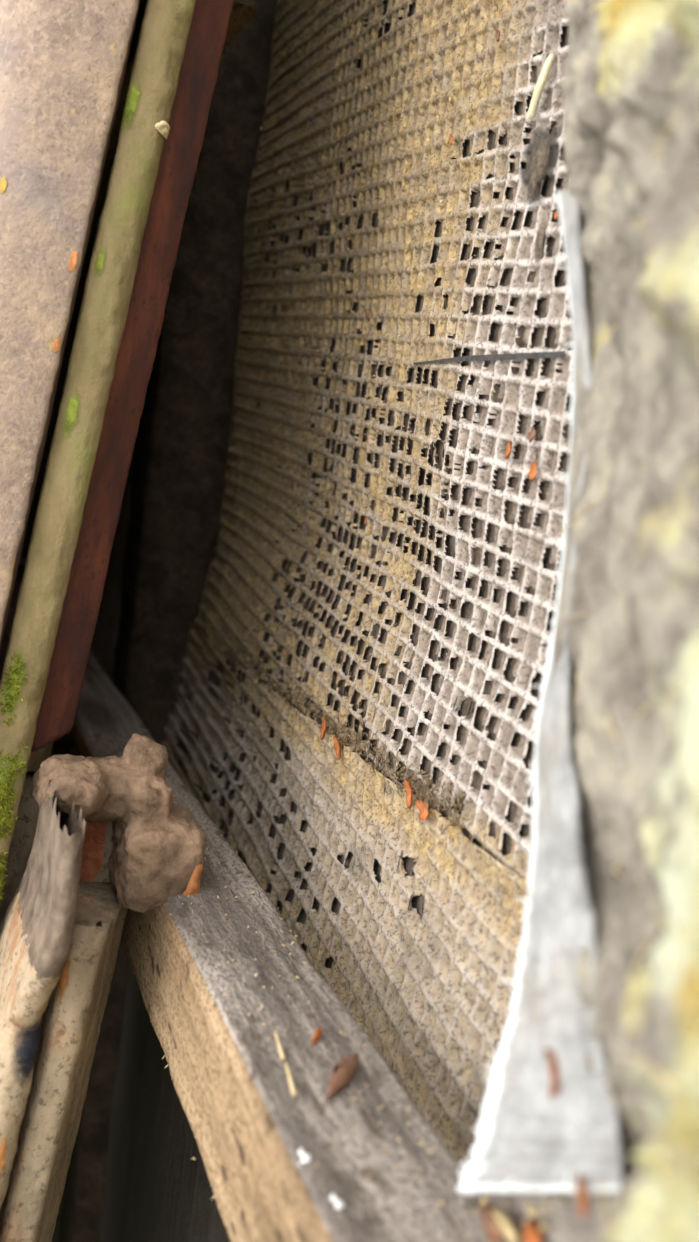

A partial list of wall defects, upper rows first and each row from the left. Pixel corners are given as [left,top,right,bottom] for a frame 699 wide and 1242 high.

spalling [182,864,203,896]